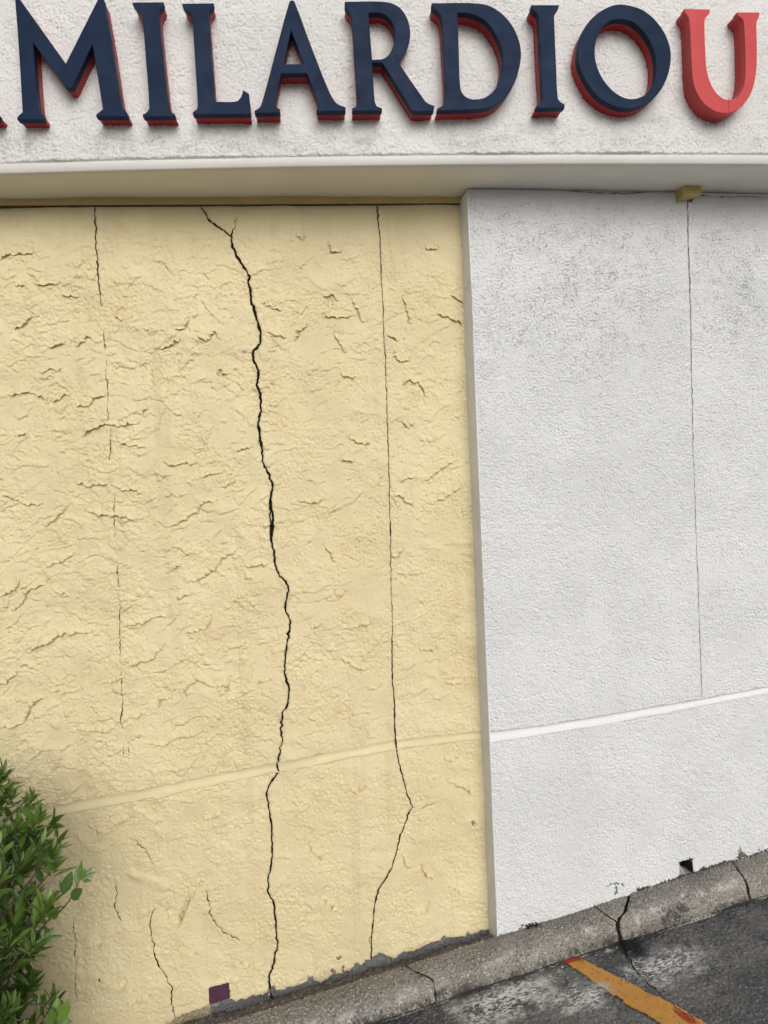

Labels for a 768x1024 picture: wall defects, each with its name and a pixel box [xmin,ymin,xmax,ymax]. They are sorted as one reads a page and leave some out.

crack [201,208,291,994]
crack [369,206,433,959]
spalling [607,847,768,895]
crack [149,909,175,1018]
crack [594,896,698,1023]